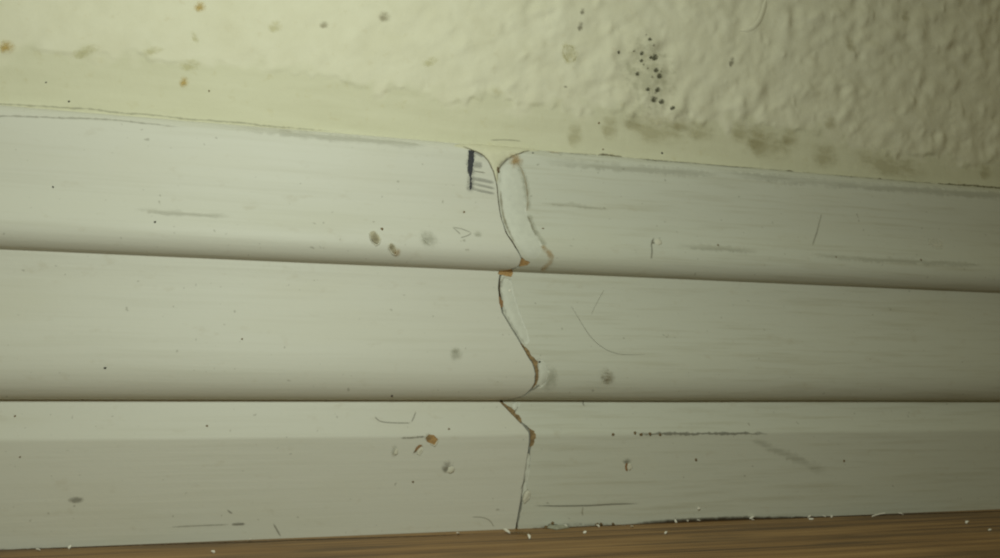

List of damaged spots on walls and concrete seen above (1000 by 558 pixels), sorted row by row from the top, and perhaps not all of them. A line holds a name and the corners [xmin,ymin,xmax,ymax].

leakage [636,52,675,110]
crack [498,206,530,308]
crack [521,343,539,388]
peeling [414,434,439,455]
crack [499,400,536,447]